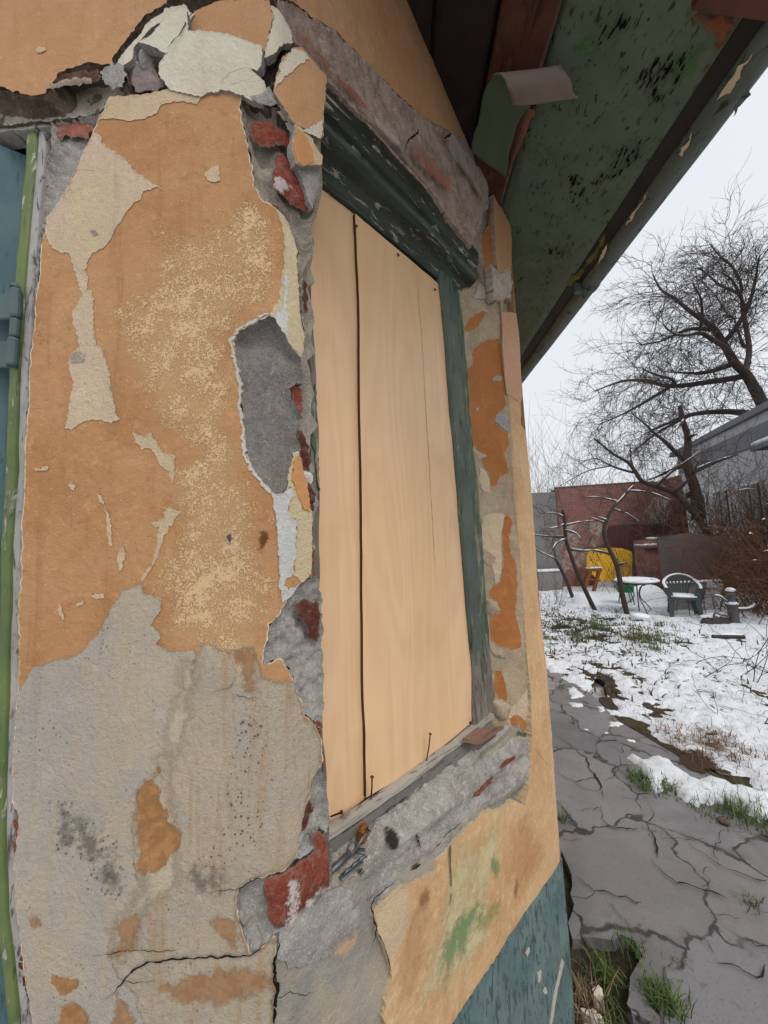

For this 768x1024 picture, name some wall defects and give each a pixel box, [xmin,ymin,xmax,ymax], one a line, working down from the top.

peeling [467,338,510,493]
peeling [0,0,489,1024]
peeling [482,513,529,731]
flaking render [473,756,516,797]
crack [534,738,767,926]
crack [92,937,312,1024]
crack [707,940,768,978]